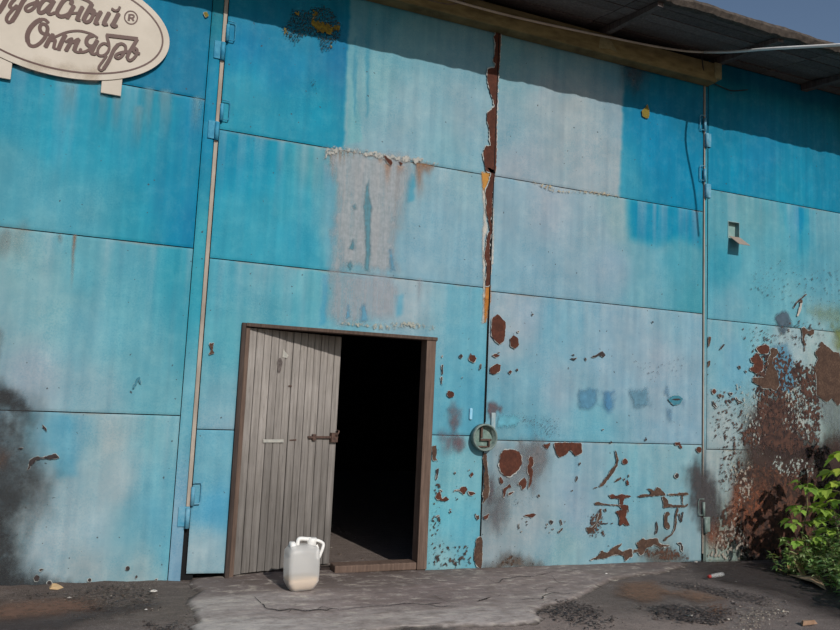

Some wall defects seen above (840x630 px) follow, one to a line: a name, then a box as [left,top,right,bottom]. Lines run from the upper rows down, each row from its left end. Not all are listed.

peeling [282,6,341,51]
peeling [325,146,435,166]
peeling [482,32,502,287]
damp [0,388,47,586]
corrosion [732,401,840,561]
damp [820,400,840,431]